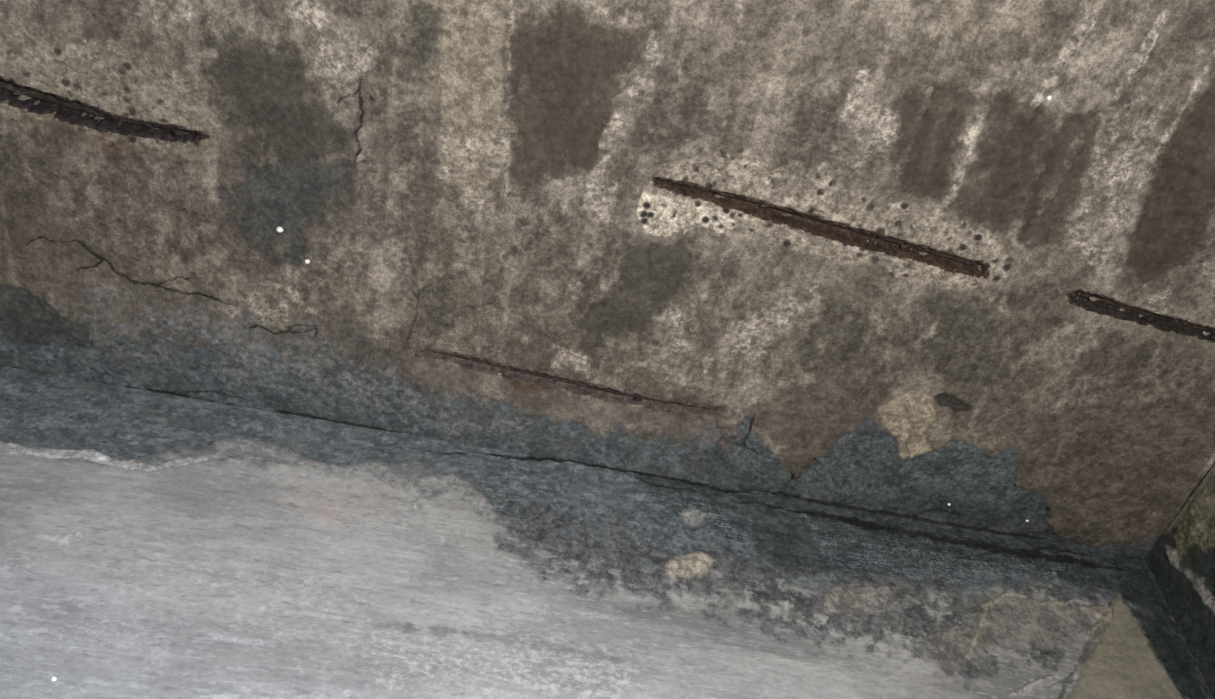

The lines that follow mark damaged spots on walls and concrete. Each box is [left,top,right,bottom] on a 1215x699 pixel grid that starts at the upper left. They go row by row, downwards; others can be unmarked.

damp [199,41,354,267]
damp [501,10,631,188]
damp [892,84,1098,247]
damp [1127,73,1215,282]
crack [26,236,318,338]
damp [580,232,692,349]
peeling [0,440,494,519]
spalling [439,352,709,409]
damp [0,284,1215,699]
spalling [877,390,971,459]
peeling [665,551,715,577]
peeling [821,582,892,614]